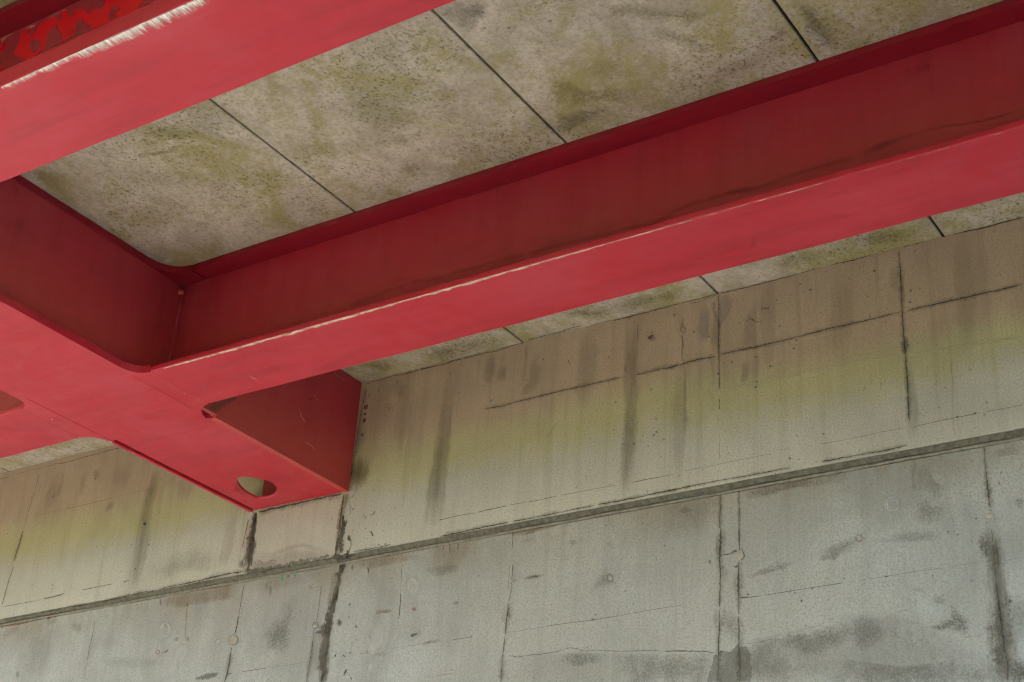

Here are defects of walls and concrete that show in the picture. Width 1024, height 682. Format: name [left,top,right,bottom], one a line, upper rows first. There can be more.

peeling [0,0,203,87]